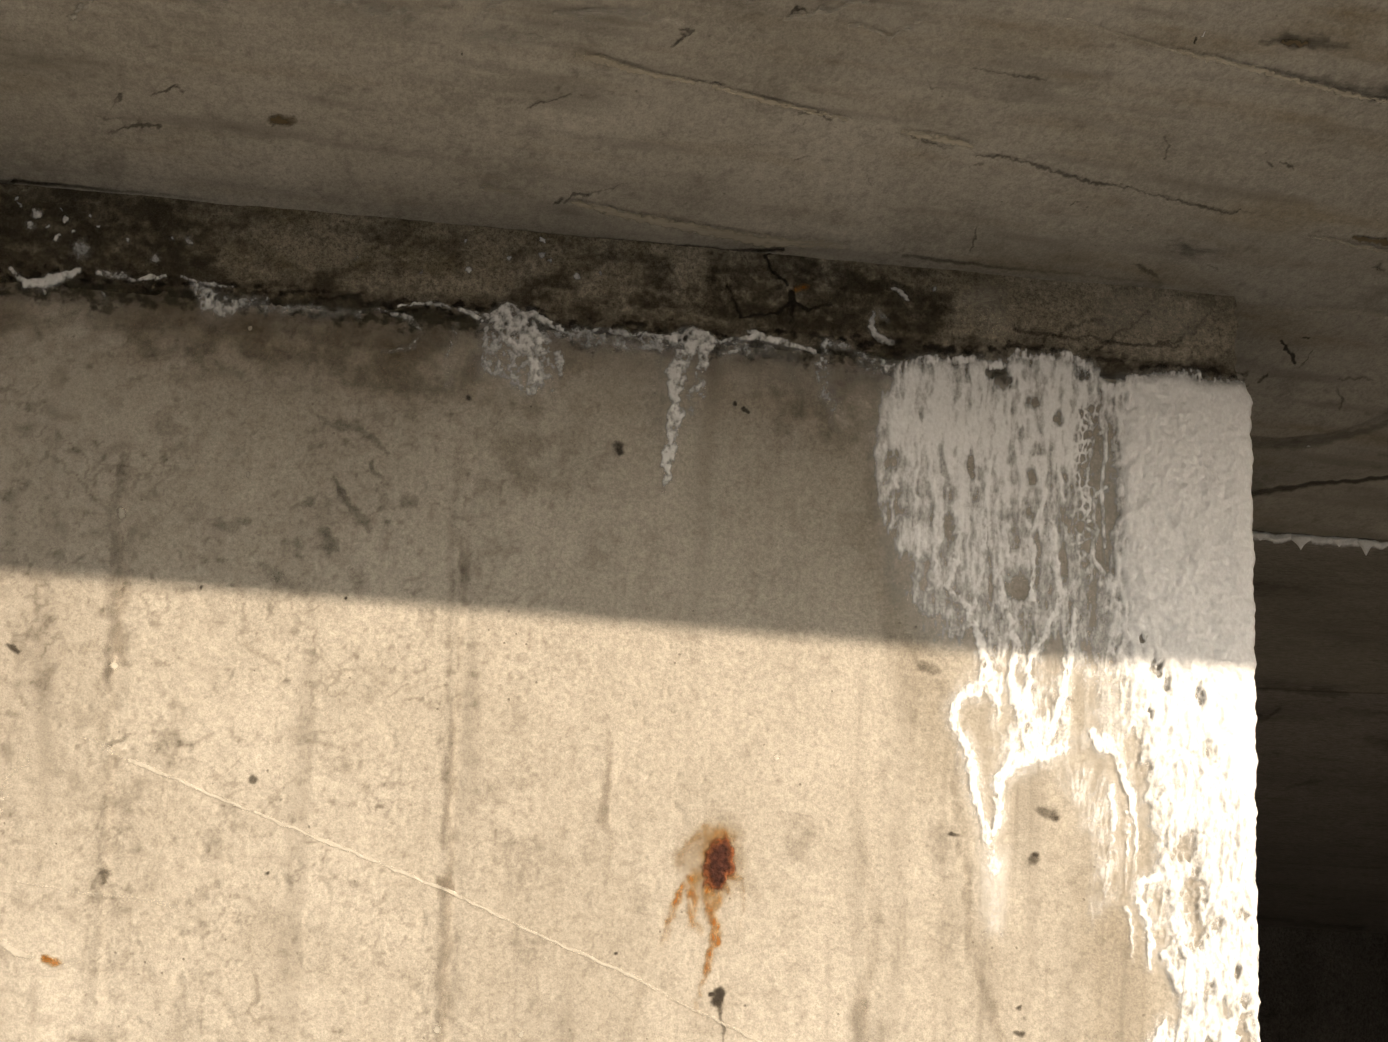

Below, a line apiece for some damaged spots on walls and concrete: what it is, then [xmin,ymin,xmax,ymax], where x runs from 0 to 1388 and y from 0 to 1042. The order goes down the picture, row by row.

crack [977,155,1106,186]
crack [0,238,1248,382]
leakage [381,301,846,485]
crack [1271,379,1388,448]
crack [1251,475,1388,498]
leakage [864,313,1388,1042]
corrosion [666,829,736,976]